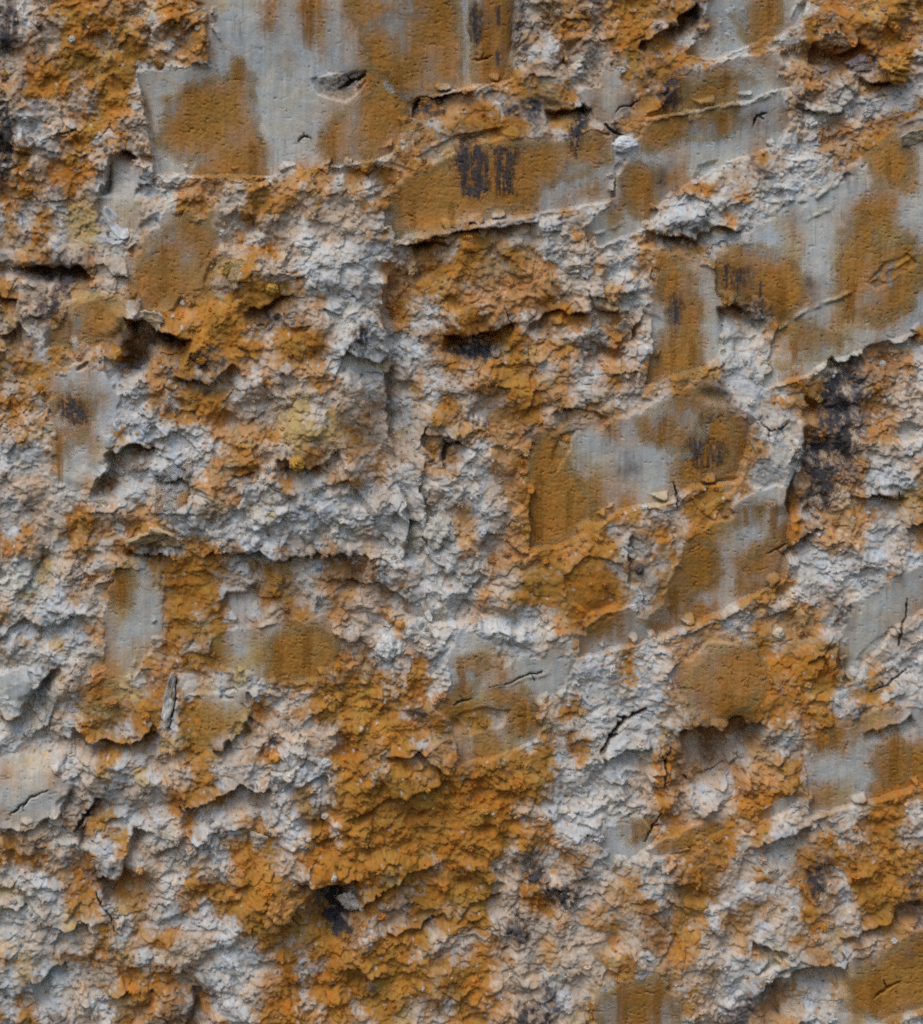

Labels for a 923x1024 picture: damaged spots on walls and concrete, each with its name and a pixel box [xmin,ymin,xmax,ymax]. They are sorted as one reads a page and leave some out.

corrosion [154,56,268,178]
corrosion [321,0,518,163]
corrosion [391,138,613,234]
spalling [396,212,648,426]
damp [802,363,859,504]
crack [867,597,910,693]
crack [7,789,50,815]
spalling [22,672,175,758]
crack [597,705,648,756]
spalling [666,715,771,807]
damp [321,885,352,935]
spalling [746,965,838,1024]